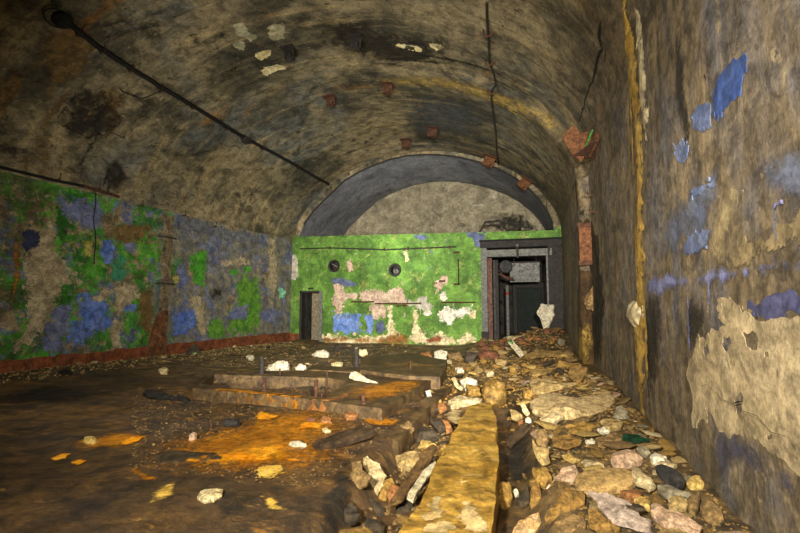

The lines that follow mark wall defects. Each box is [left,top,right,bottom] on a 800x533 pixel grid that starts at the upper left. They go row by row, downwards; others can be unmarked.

water stain [58,89,121,166]
peeling [231,22,257,50]
peeling [255,23,286,76]
water stain [325,22,511,80]
crack [578,20,606,124]
peeling [673,138,689,163]
peeling [691,52,747,132]
rust [622,0,648,417]
peeling [683,228,709,256]
peeling [322,258,476,345]
peeling [686,289,800,476]